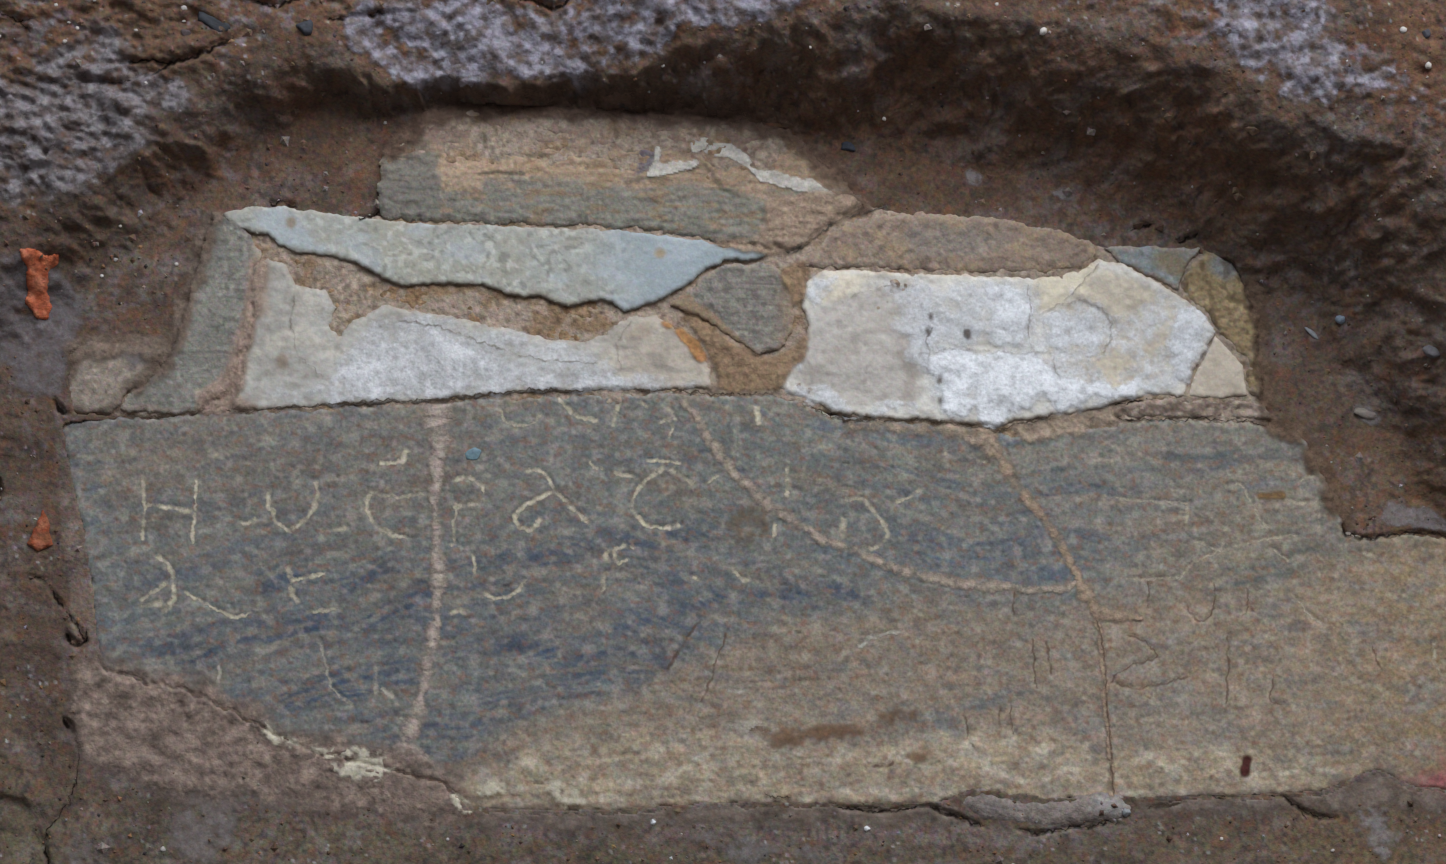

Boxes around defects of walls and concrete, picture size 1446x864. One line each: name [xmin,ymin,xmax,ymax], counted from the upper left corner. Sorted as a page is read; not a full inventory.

crack [29,576,88,646]
crack [627,388,1143,836]
crack [29,717,80,864]
crack [1148,793,1335,819]